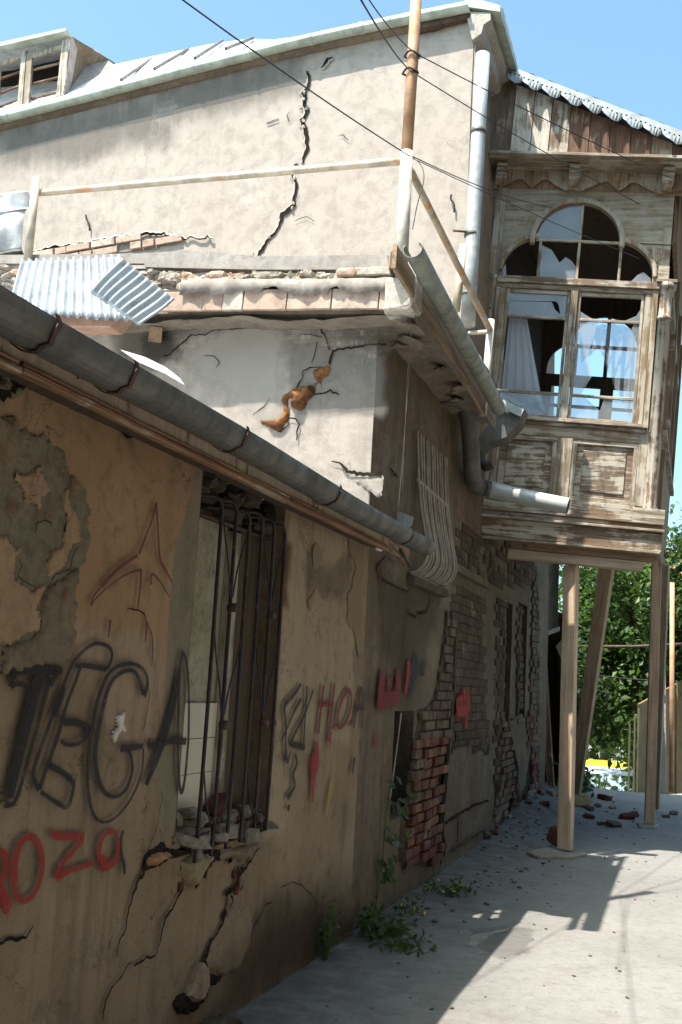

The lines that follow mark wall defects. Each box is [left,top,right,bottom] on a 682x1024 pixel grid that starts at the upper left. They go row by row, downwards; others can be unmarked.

crack [253,57,334,256]
spalling [33,230,213,255]
crack [163,328,245,367]
crack [290,329,386,395]
crack [278,417,300,441]
flaking render [0,415,91,678]
spalling [398,610,458,870]
spalling [493,710,540,823]
crack [103,793,184,1018]
crack [199,847,319,967]